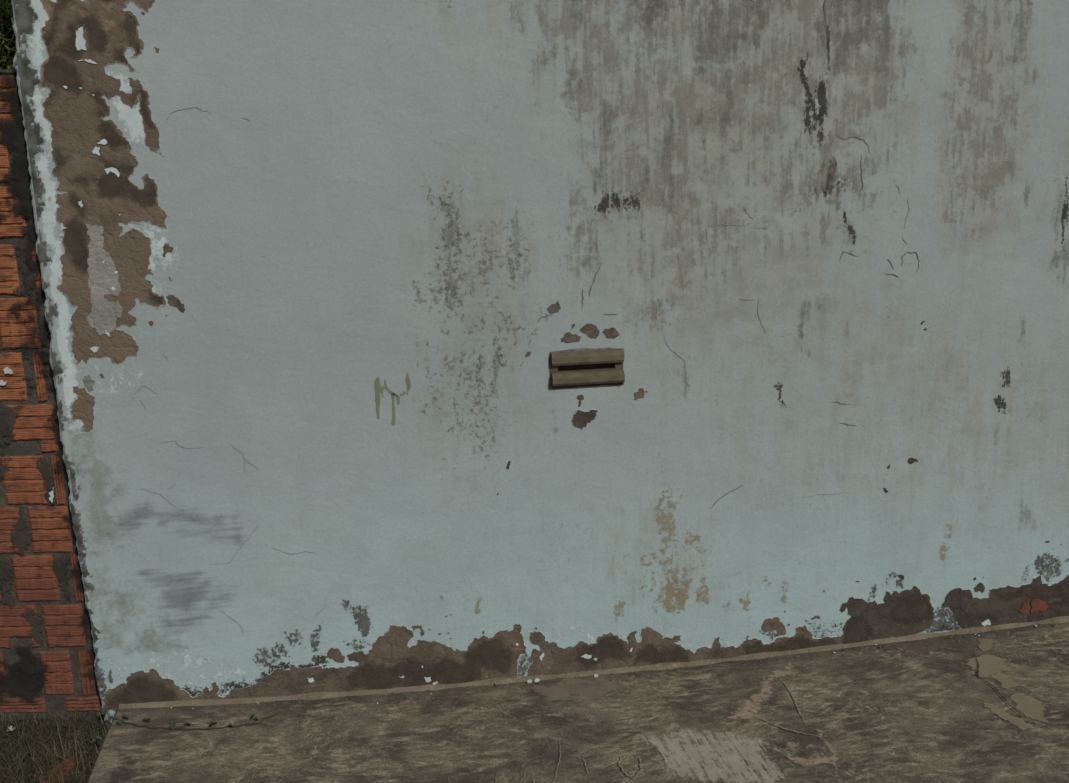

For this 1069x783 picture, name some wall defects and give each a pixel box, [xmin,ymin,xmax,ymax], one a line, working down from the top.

peeling [38,0,185,432]
leakage [413,185,532,315]
leakage [536,0,916,306]
leakage [945,0,1016,207]
leakage [428,312,535,457]
spalling [571,395,598,430]
peeling [561,323,620,343]
leakage [1018,553,1069,583]
leakage [0,645,48,703]
peeling [102,573,1069,712]